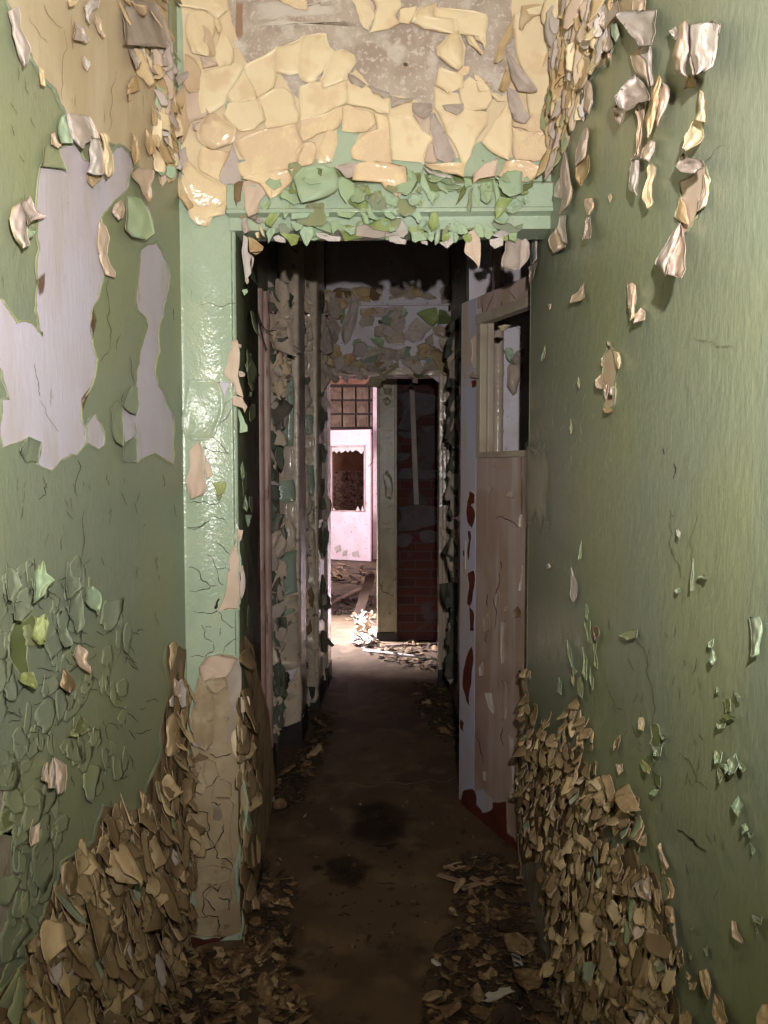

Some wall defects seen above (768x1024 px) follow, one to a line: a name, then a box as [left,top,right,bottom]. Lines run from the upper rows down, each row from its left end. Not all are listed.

peeling [0,0,670,473]
peeling [655,19,721,278]
crack [3,460,145,618]
crack [162,475,238,657]
crack [189,753,233,931]
peeling [0,278,524,1024]
peeling [461,541,728,1024]
peeling [716,687,744,729]
peeling [714,750,746,783]
peeling [731,795,755,855]
peeling [749,617,763,657]